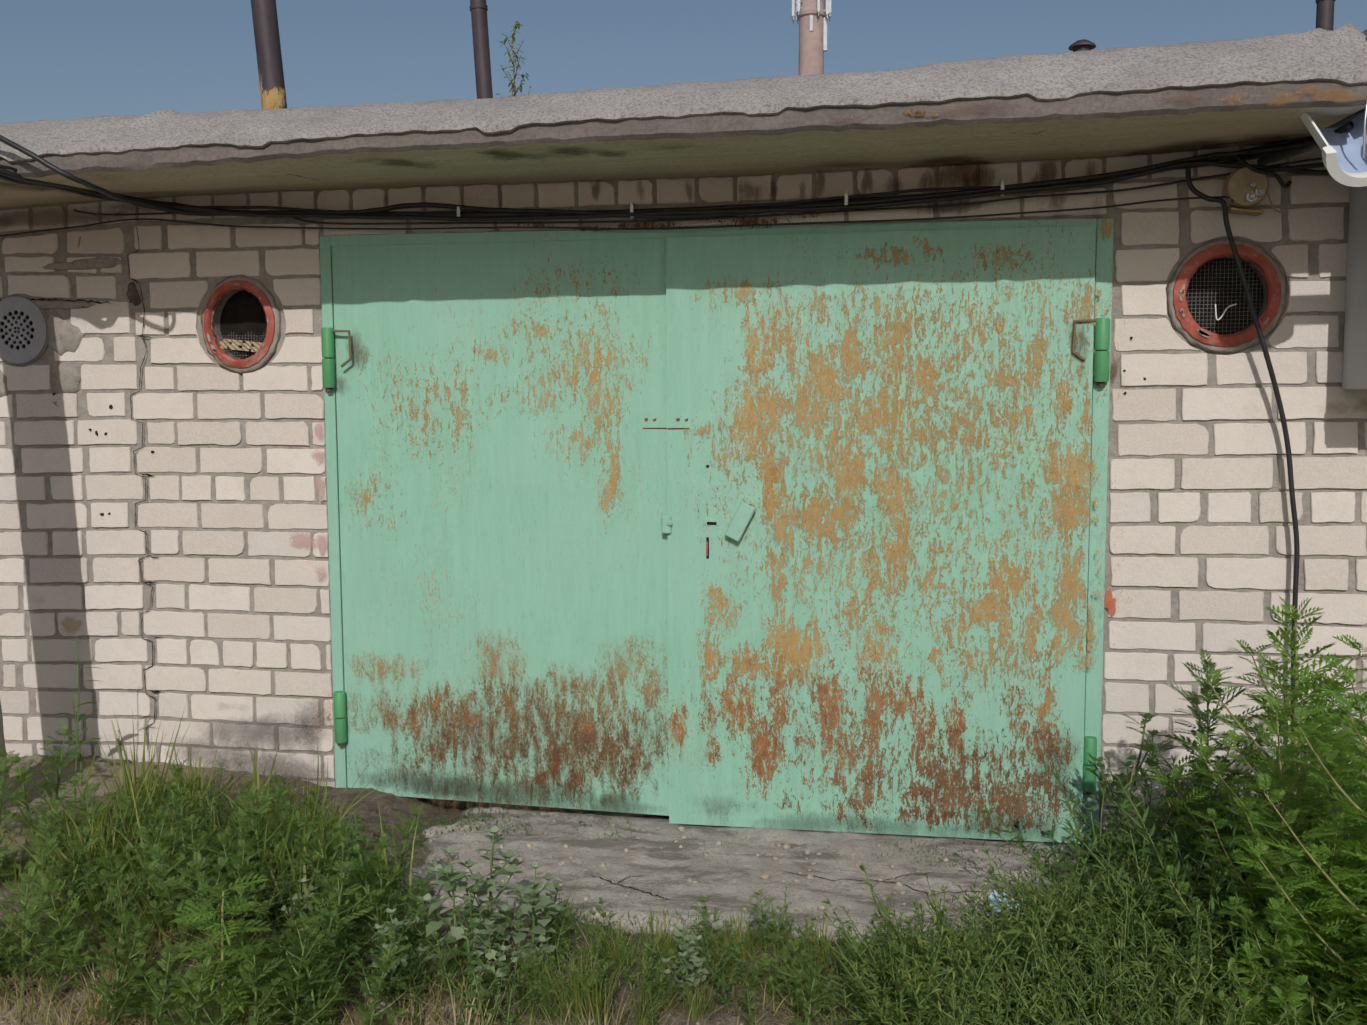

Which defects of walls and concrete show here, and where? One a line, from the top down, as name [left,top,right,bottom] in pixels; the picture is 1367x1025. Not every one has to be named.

rust [338,201,1130,836]